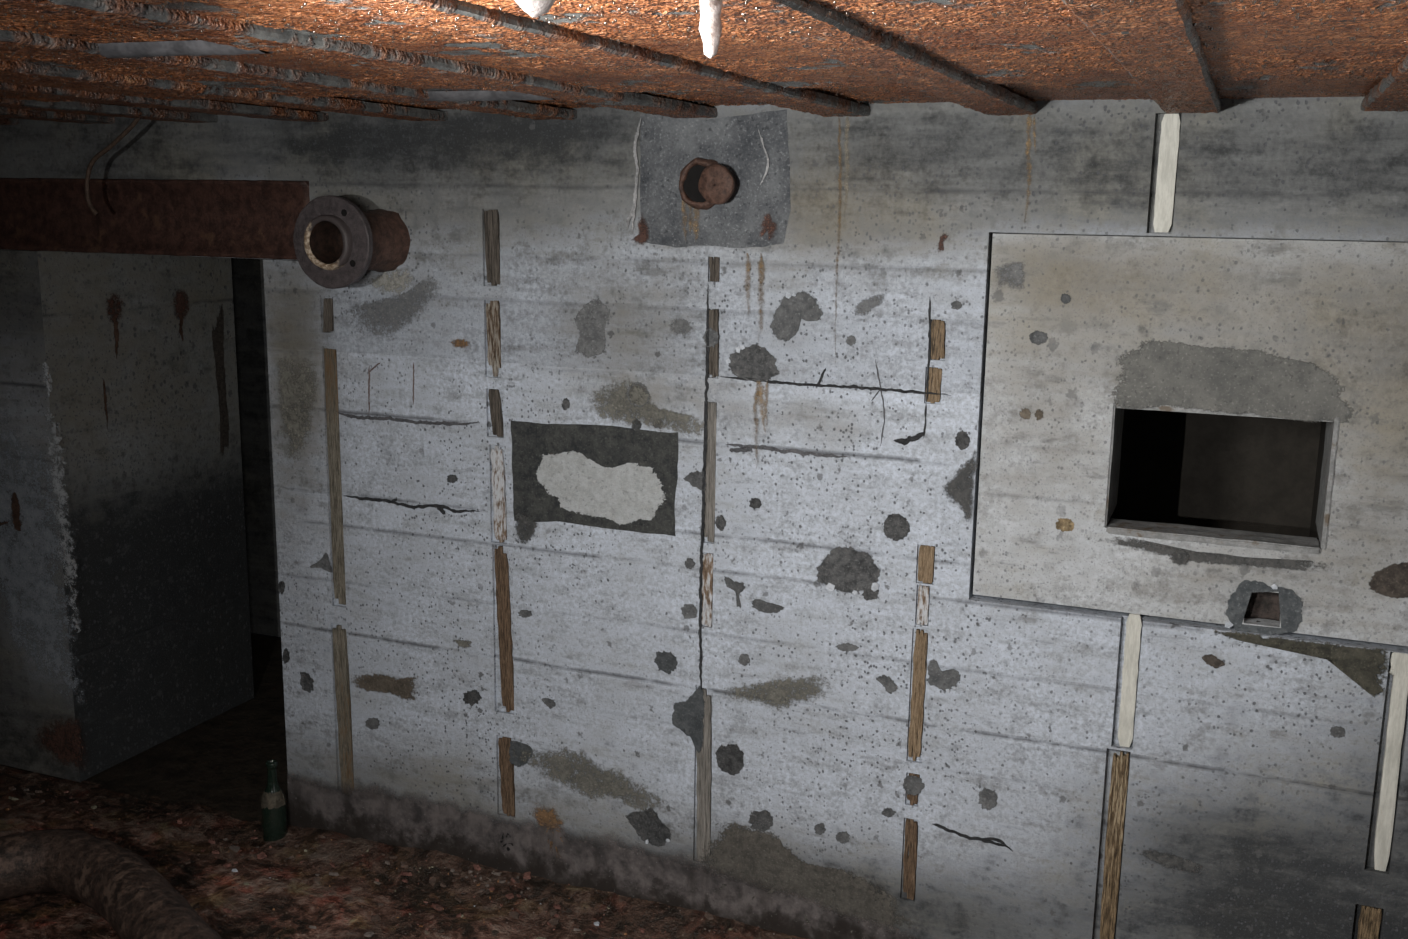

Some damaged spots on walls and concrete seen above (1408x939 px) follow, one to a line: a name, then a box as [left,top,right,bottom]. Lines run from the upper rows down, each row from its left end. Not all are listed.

rust [107,294,123,359]
rust [173,289,189,341]
peeling [574,298,610,359]
spalling [670,291,823,382]
crack [344,495,480,515]
spalling [816,546,880,601]
spalling [1225,580,1303,635]
leakage [287,775,917,939]
crack [933,823,1013,852]
leakage [1143,850,1202,873]